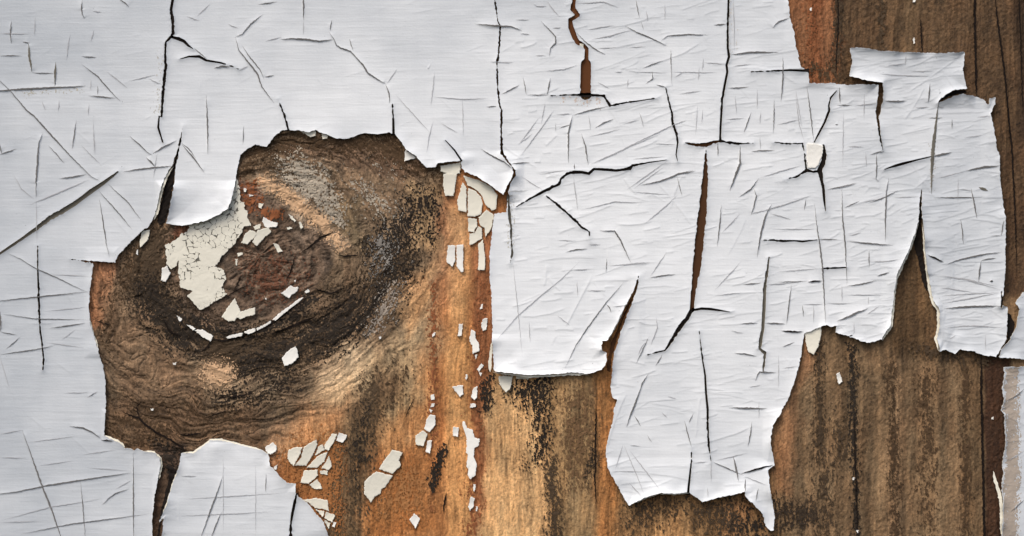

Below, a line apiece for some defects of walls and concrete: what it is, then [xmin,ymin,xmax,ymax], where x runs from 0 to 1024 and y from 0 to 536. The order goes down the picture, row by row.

crack [280,0,395,135]
crack [0,0,291,370]
crack [445,140,529,167]
peeling [788,0,1024,332]
crack [202,231,357,352]
peeling [71,130,1024,536]
crack [489,0,1023,536]
crack [1,393,254,536]
crack [289,493,299,536]